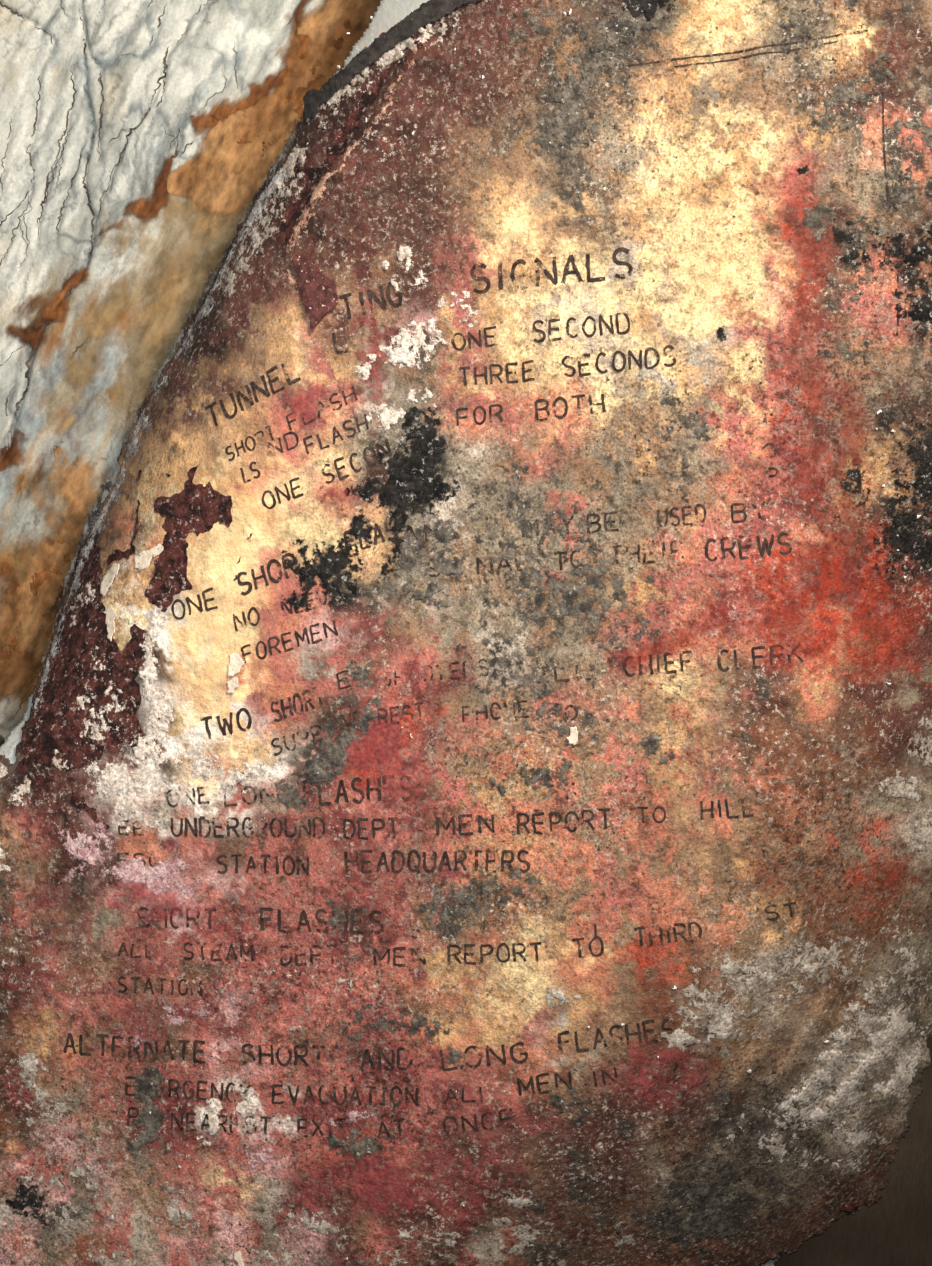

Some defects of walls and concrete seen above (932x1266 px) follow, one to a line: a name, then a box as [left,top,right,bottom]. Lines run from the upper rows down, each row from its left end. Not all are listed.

damp [497,0,683,174]
rust [6,268,89,349]
rust [62,280,129,385]
crack [0,0,238,436]
rust [100,0,383,398]
damp [797,117,932,330]
rust [0,395,102,700]
peeling [17,466,233,830]
damp [280,405,666,792]
damp [488,776,508,796]
damp [640,731,674,765]
damp [646,380,709,504]